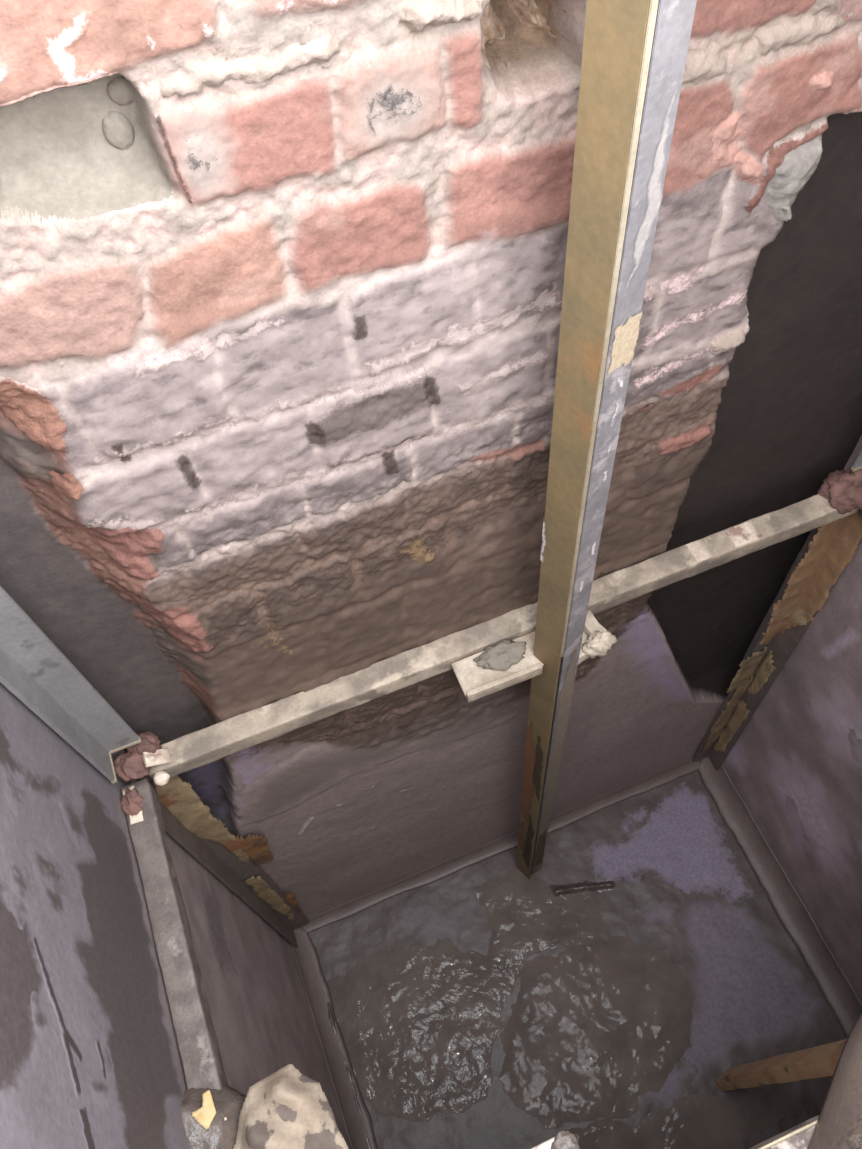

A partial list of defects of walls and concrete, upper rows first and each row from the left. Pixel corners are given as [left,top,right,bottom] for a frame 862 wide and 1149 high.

damp [37,7,112,86]
damp [278,0,344,15]
spalling [481,0,566,78]
spalling [0,73,176,224]
spalling [743,118,829,217]
spalling [0,376,84,500]
spalling [80,524,166,581]
spalling [136,596,217,654]
rust [703,510,862,753]
rust [153,775,303,922]
damp [0,715,184,1149]
crack [32,937,106,1149]